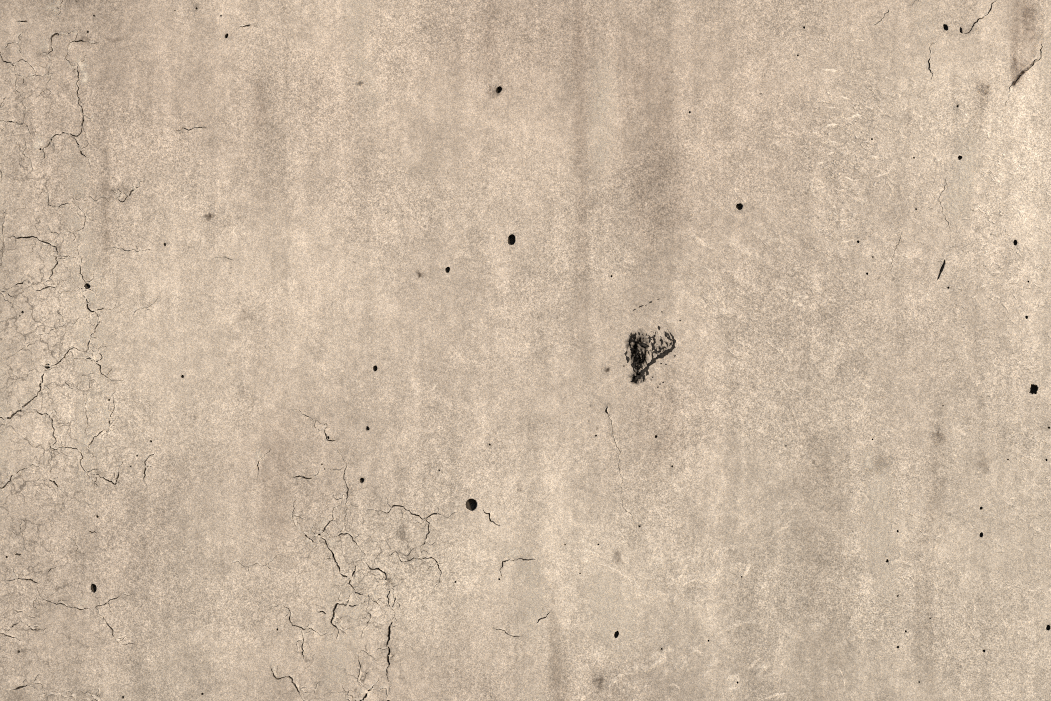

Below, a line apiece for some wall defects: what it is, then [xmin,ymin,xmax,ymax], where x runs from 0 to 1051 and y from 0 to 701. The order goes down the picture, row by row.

crack [0,0,157,493]
crack [255,451,270,477]
crack [483,510,501,526]
crack [270,409,458,701]
crack [498,548,536,577]
crack [0,520,133,659]
crack [6,675,100,701]